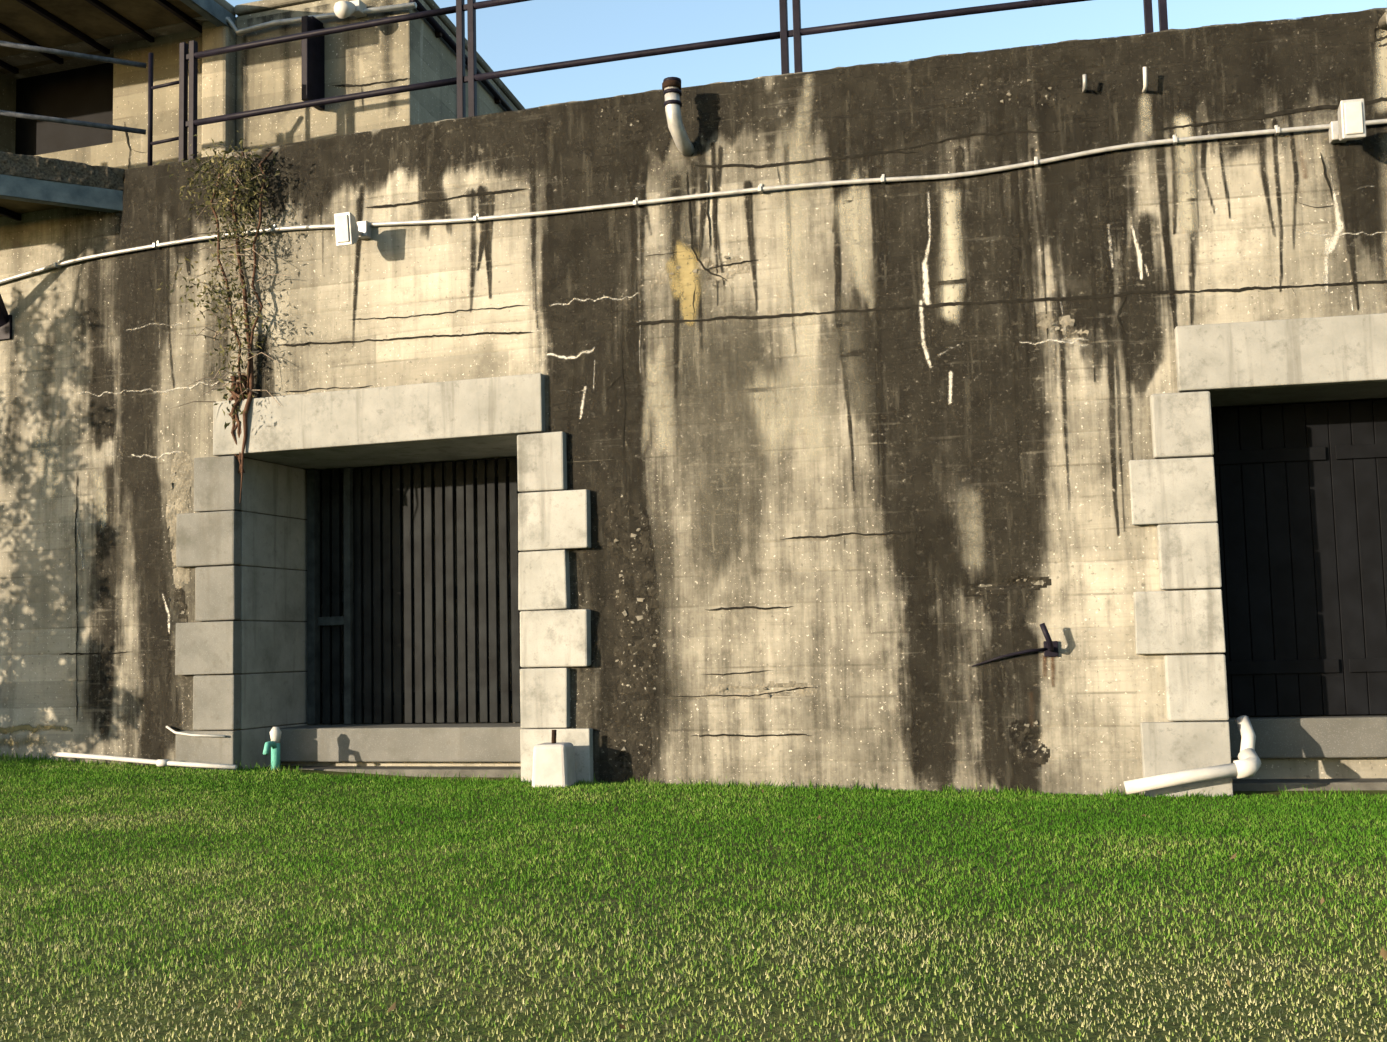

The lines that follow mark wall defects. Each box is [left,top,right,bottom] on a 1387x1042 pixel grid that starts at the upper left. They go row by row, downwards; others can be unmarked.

leakage [418,125,451,236]
leakage [1325,31,1387,311]
leakage [467,186,494,312]
rust [667,244,699,324]
leakage [78,163,228,767]
leakage [253,336,274,398]
leakage [531,26,1298,794]